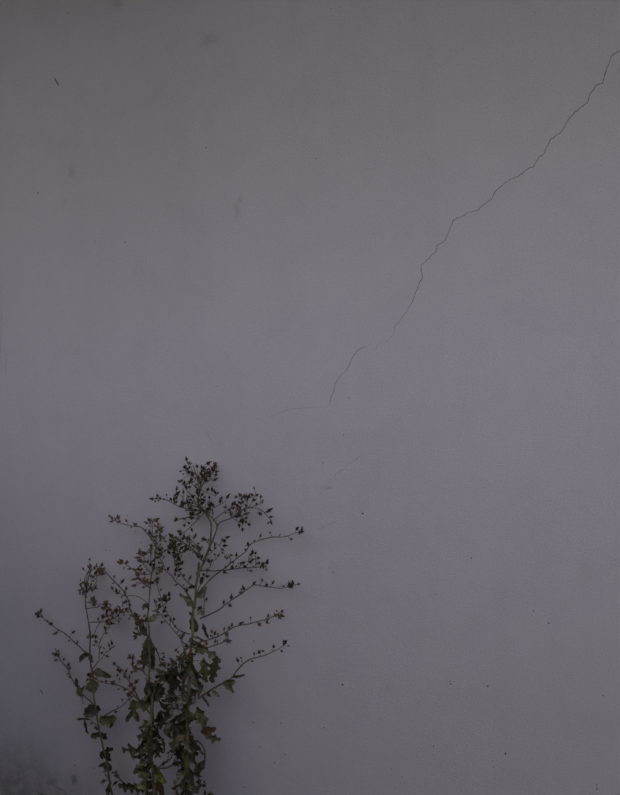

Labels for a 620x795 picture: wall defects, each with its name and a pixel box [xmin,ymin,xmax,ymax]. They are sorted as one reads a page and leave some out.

crack [391,50,620,337]